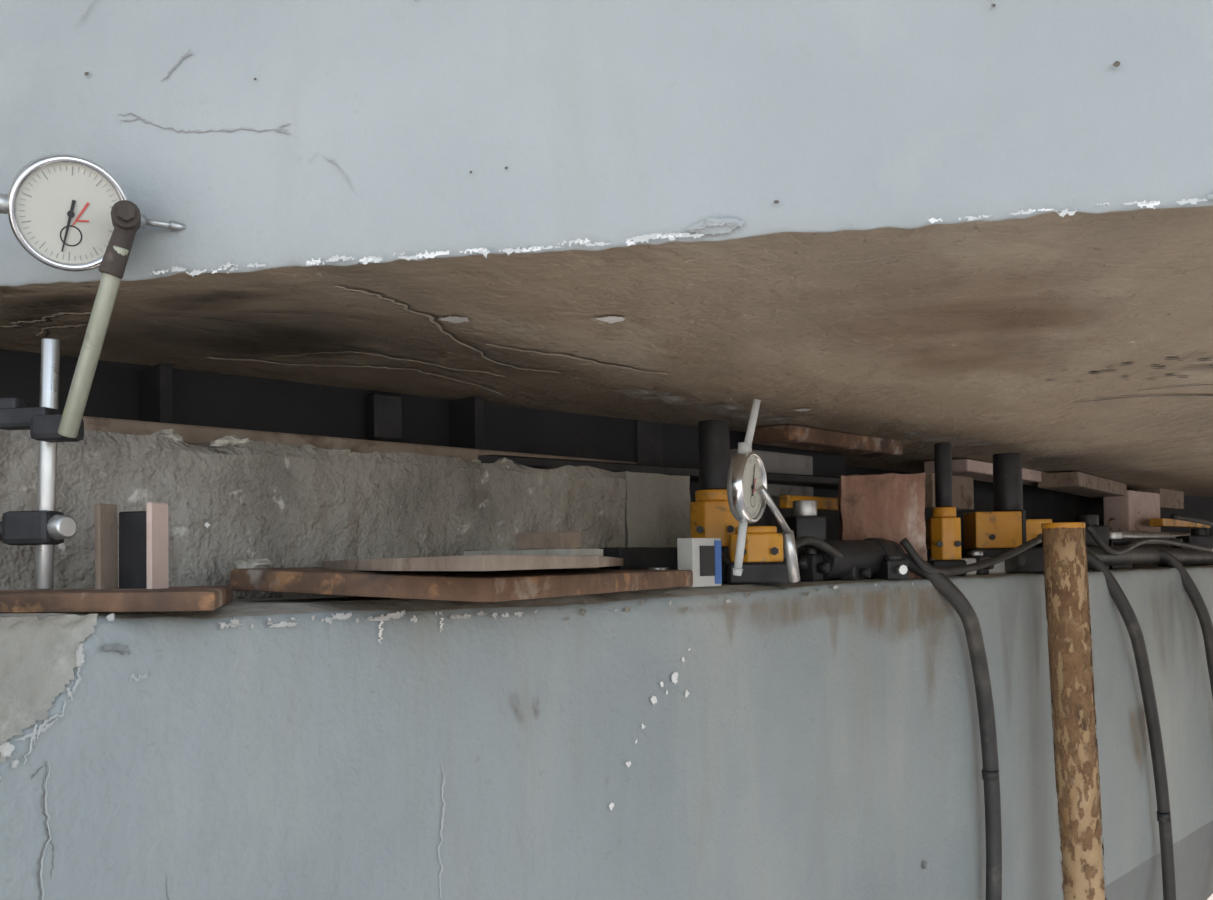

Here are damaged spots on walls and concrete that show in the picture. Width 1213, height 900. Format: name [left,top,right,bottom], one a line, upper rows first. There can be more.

crack [118,112,290,134]
spalling [0,613,115,779]
peeling [101,643,130,655]
crack [31,760,54,900]